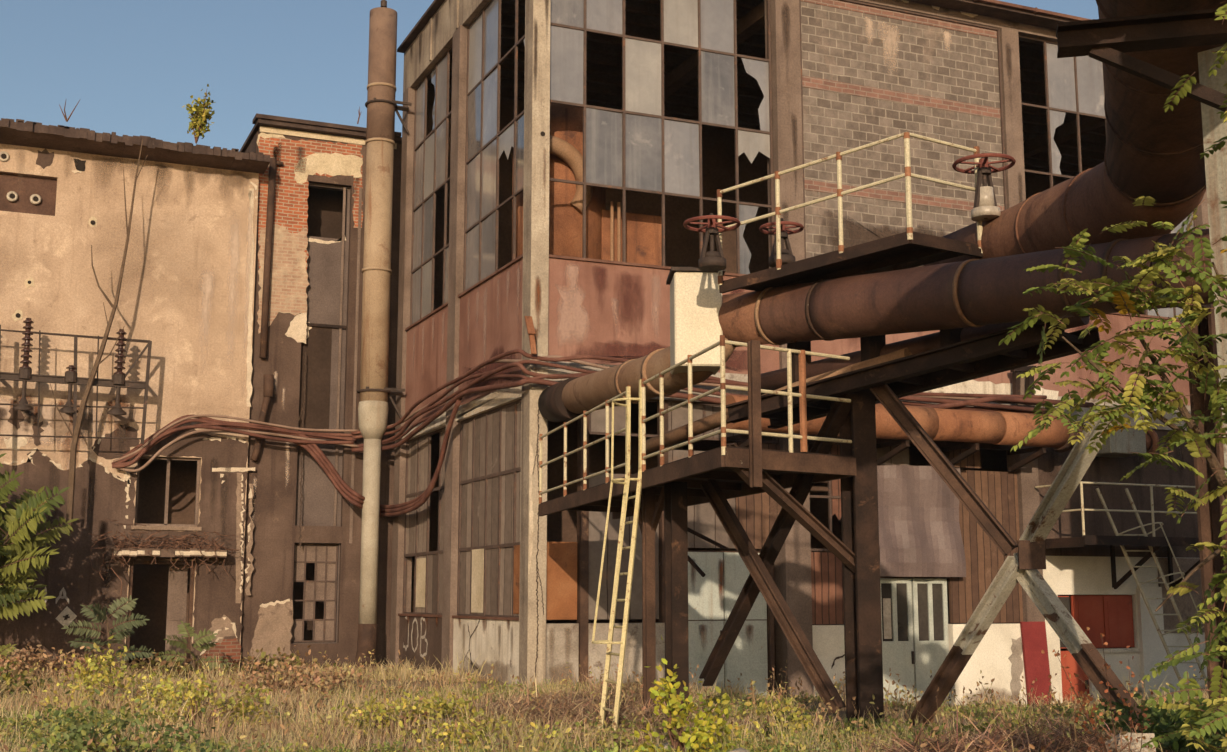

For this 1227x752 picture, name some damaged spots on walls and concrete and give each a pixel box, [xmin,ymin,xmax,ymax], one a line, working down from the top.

flaking render [246,132,363,407]
leakage [558,265,588,341]
rust [590,343,666,362]
rust [725,351,747,371]
peeling [0,402,293,671]